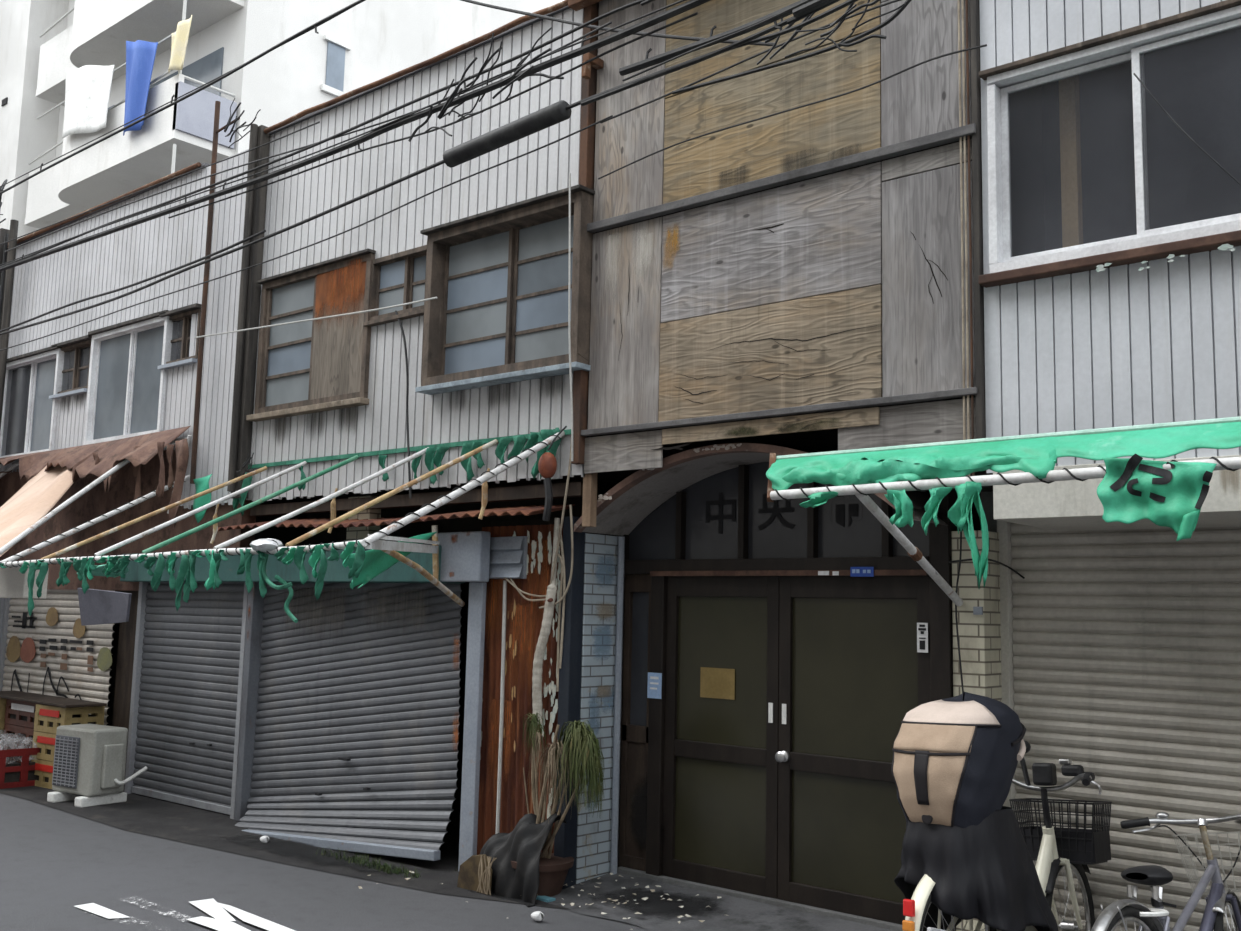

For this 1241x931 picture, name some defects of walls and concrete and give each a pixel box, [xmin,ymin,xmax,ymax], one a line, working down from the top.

crack [911,232,948,304]
corrosion [487,540,550,679]
corrosion [489,691,512,769]